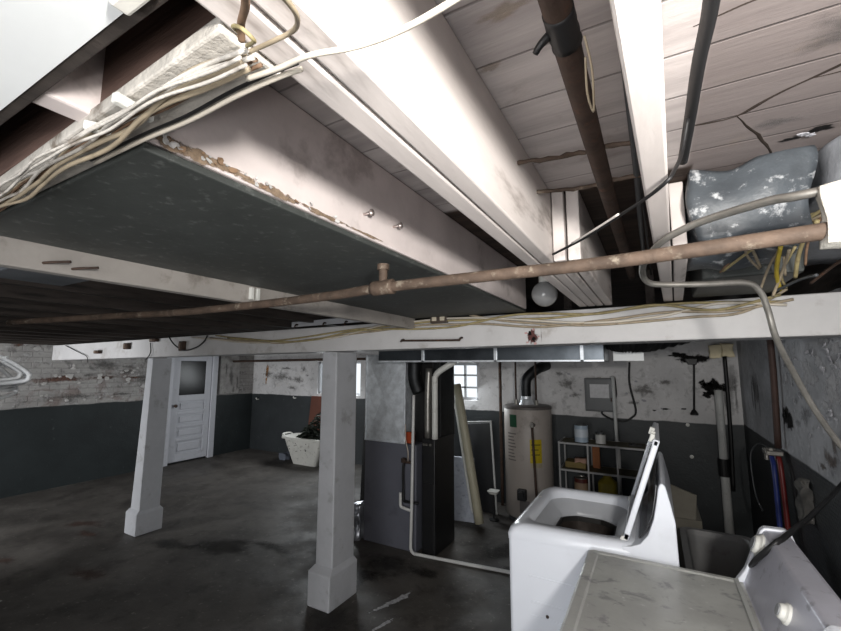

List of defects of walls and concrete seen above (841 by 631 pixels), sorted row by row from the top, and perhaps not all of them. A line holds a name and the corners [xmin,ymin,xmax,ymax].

crack [695,63,841,153]
peeling [155,133,383,242]